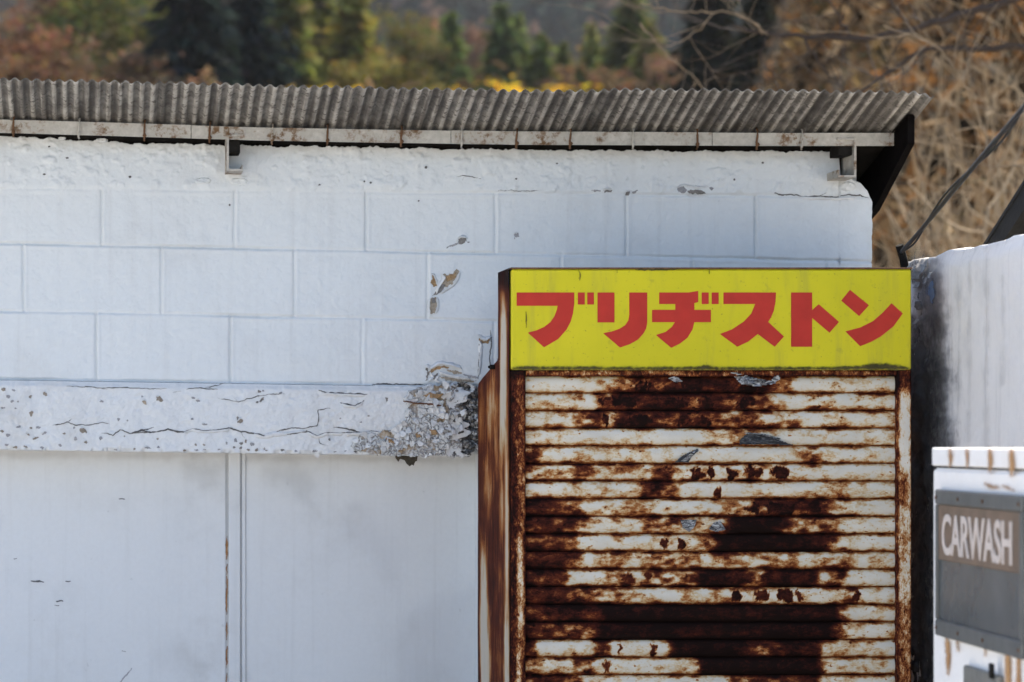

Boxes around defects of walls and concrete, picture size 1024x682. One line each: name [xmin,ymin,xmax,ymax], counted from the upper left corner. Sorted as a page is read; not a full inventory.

peeling [427,269,461,314]
crack [56,383,425,446]
spalling [351,361,478,466]
water stain [911,259,949,682]
corrosion [985,448,1015,490]